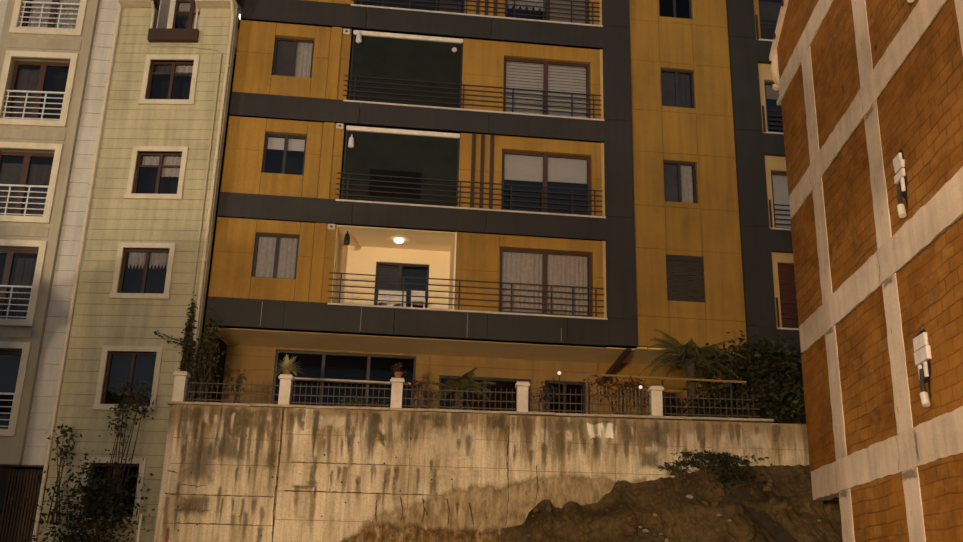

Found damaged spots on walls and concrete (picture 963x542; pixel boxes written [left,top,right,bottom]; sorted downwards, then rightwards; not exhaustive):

water stain [178,407,279,479]
water stain [289,411,475,520]
water stain [488,416,779,468]
water stain [164,480,263,542]